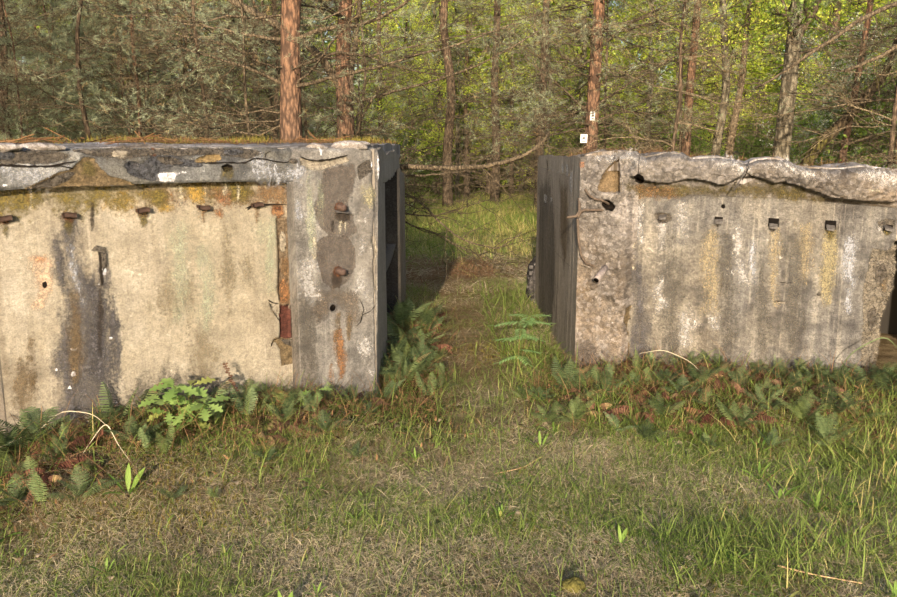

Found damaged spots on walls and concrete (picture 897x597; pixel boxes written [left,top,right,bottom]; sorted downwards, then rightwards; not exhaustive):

spalling [567,160,620,219]
water stain [625,183,824,246]
water stain [52,219,231,426]
corrosion [330,313,352,378]
spalling [624,305,639,365]
water stain [630,221,697,363]
water stain [703,224,865,351]
spalling [860,245,897,374]